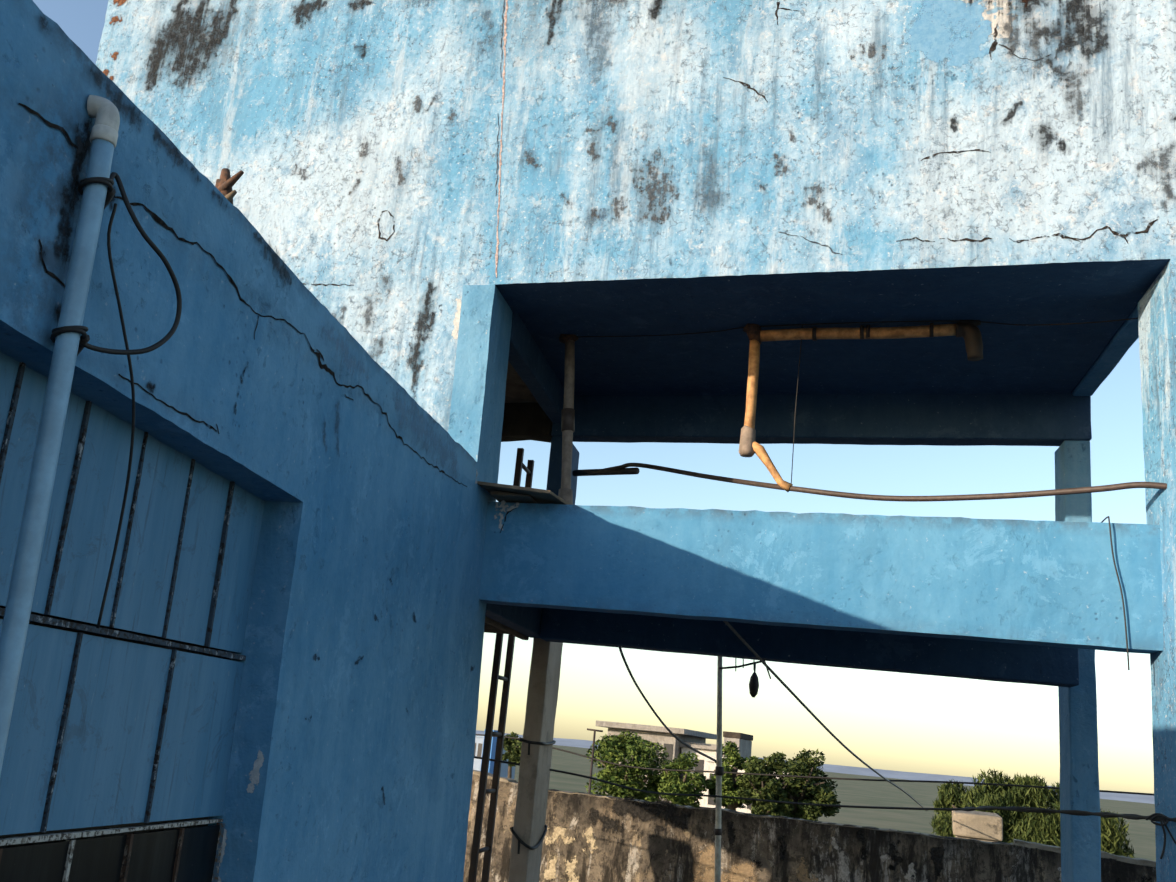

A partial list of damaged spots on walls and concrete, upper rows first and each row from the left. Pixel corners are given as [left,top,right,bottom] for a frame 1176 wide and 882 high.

corrosion [109,0,126,25]
leakage [145,0,238,91]
crack [498,0,506,70]
crack [723,77,768,102]
leakage [988,0,1108,122]
crack [493,117,501,194]
leakage [588,149,680,227]
leakage [1137,144,1176,212]
crack [896,219,1158,243]
crack [115,196,467,487]
leakage [406,282,436,393]
peeling [247,750,264,793]